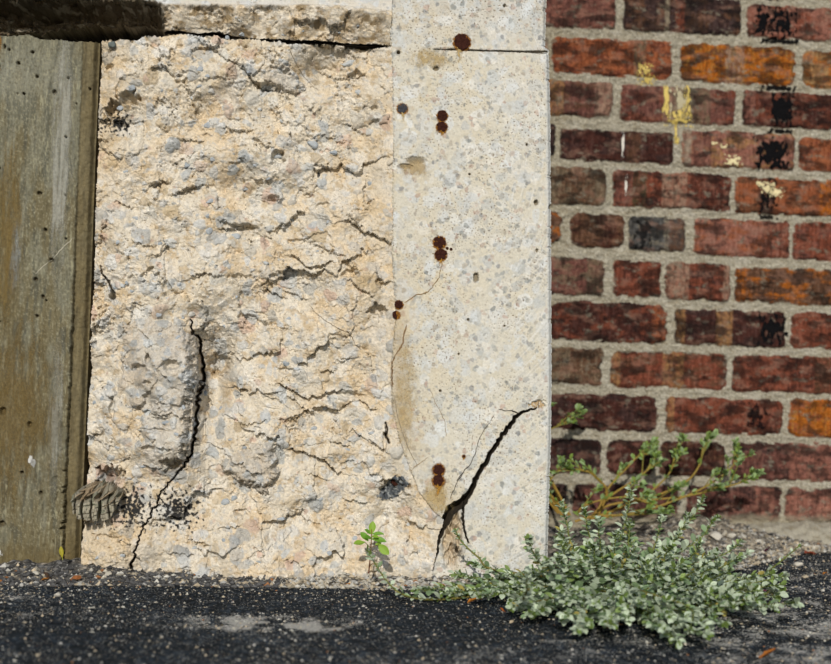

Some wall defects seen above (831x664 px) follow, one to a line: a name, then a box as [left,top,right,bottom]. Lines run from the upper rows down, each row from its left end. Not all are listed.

crack [164,31,386,90]
corrosion [452,34,471,62]
corrosion [436,110,449,135]
corrosion [433,236,452,263]
corrosion [392,300,404,332]
crack [129,320,206,569]
corrosion [431,463,446,494]
crack [433,407,537,568]